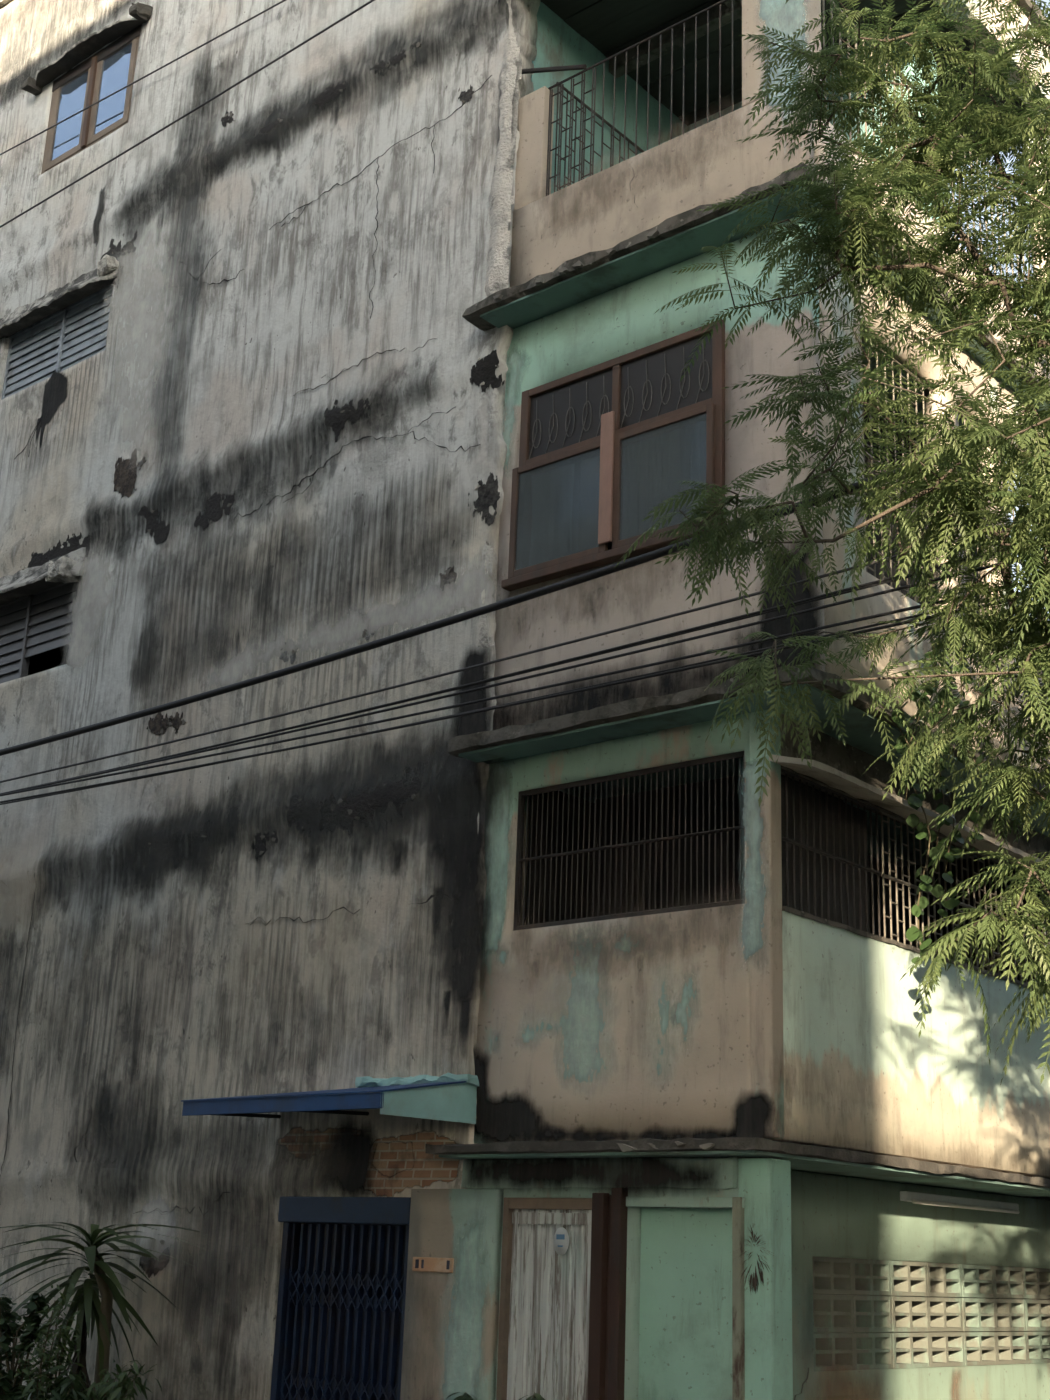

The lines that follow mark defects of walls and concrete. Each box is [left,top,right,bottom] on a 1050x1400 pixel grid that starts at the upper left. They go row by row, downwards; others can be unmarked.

crack [269,75,492,319]
water stain [86,0,521,699]
spalling [324,398,371,442]
crack [296,339,432,394]
spalling [470,350,524,456]
spalling [113,449,170,545]
spalling [468,472,500,526]
flaking render [22,532,107,664]
crack [248,907,360,926]
water stain [36,540,821,1195]
water stain [71,1084,374,1333]
water stain [952,1373,960,1400]